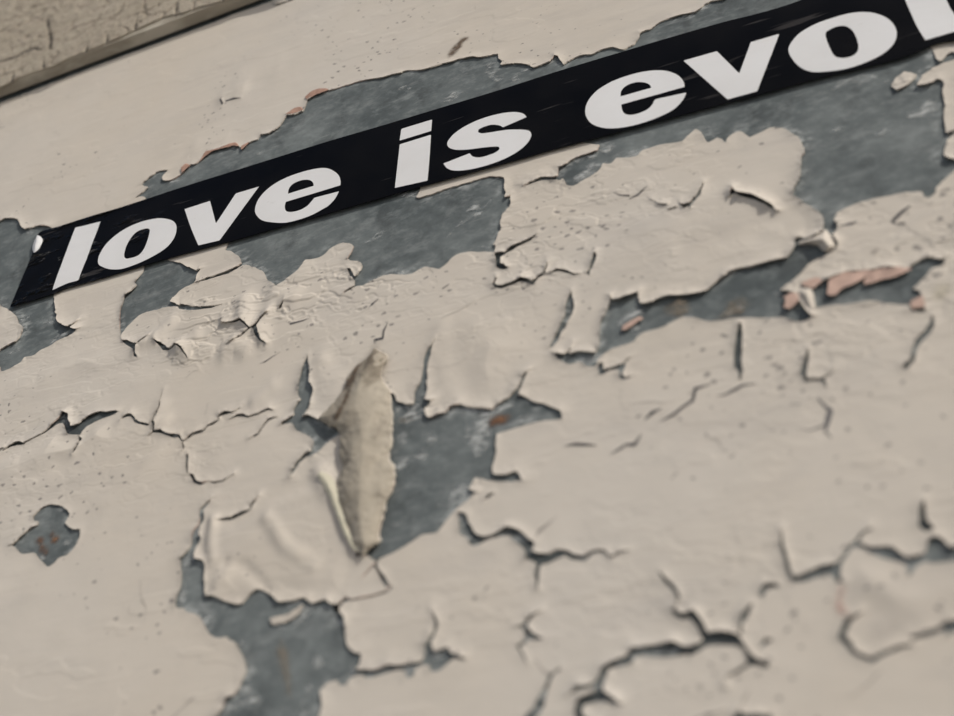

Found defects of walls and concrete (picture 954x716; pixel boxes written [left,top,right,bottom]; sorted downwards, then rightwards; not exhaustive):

crack [0,0,225,88]
peeling [138,0,799,199]
peeling [118,47,954,379]
peeling [0,214,82,372]
crack [489,232,598,348]
crack [0,403,277,485]
peeling [278,334,567,560]
crack [565,319,756,453]
peeling [8,505,80,567]
peeling [172,494,467,716]
crack [456,511,629,662]
crack [526,569,780,716]